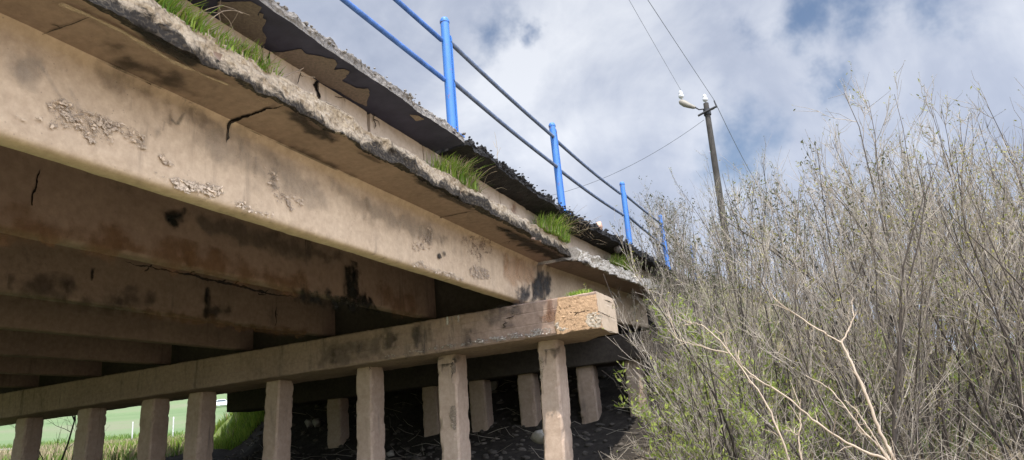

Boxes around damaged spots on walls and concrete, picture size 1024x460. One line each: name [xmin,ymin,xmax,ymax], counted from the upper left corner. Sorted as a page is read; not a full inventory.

peeling [217,1,370,106]
spalling [16,98,147,149]
crack [226,106,281,142]
crack [31,171,40,206]
leakage [165,209,186,226]
spalling [157,152,224,199]
spalling [236,166,304,218]
crack [127,262,301,326]
leakage [293,261,379,314]
leakage [518,271,551,303]
spalling [385,294,603,359]